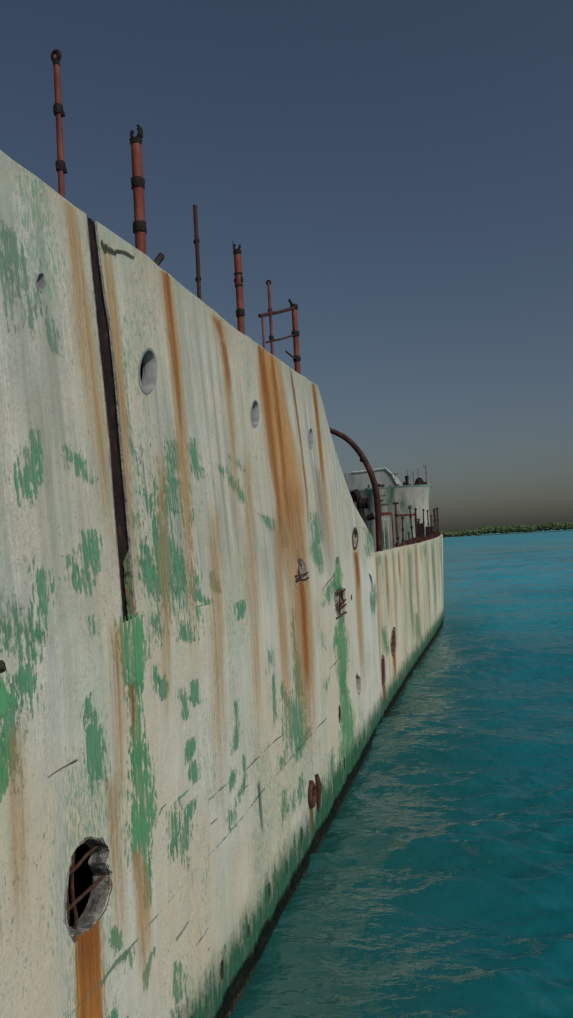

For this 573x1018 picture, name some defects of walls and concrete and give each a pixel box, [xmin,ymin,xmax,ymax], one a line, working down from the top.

corrosion [312,384,329,533]
corrosion [258,345,313,709]
peeling [0,528,103,803]
peeling [80,691,111,796]
corrosion [112,634,135,765]
peeling [114,431,248,908]
spalling [63,836,113,943]
corrosion [76,920,105,1018]
peeling [109,925,136,978]
corrosion [133,850,150,963]
peeling [141,947,156,990]
peeling [171,961,187,1018]